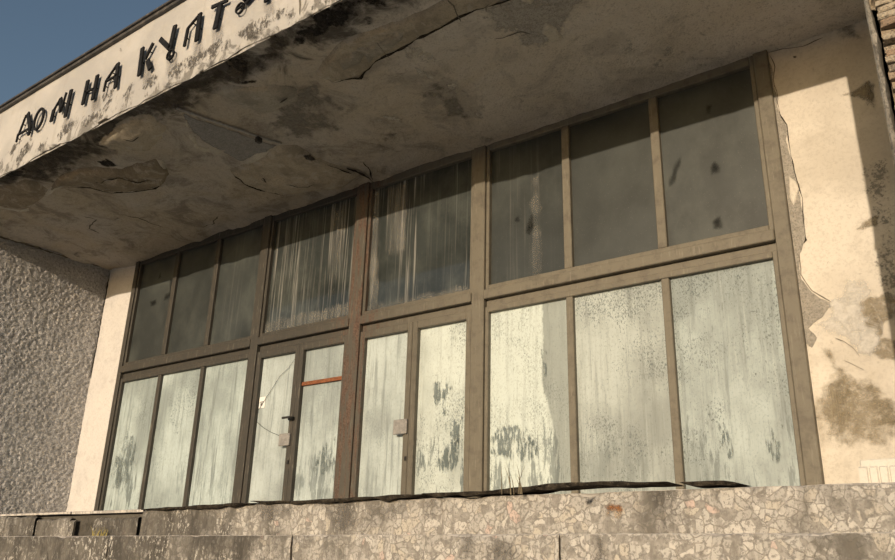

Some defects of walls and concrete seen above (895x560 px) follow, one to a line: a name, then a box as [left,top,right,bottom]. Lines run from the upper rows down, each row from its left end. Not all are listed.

leakage [149,0,386,115]
crack [334,0,510,83]
flaking render [869,0,895,103]
spalling [769,63,831,347]
leakage [822,280,895,359]
leakage [816,369,895,443]